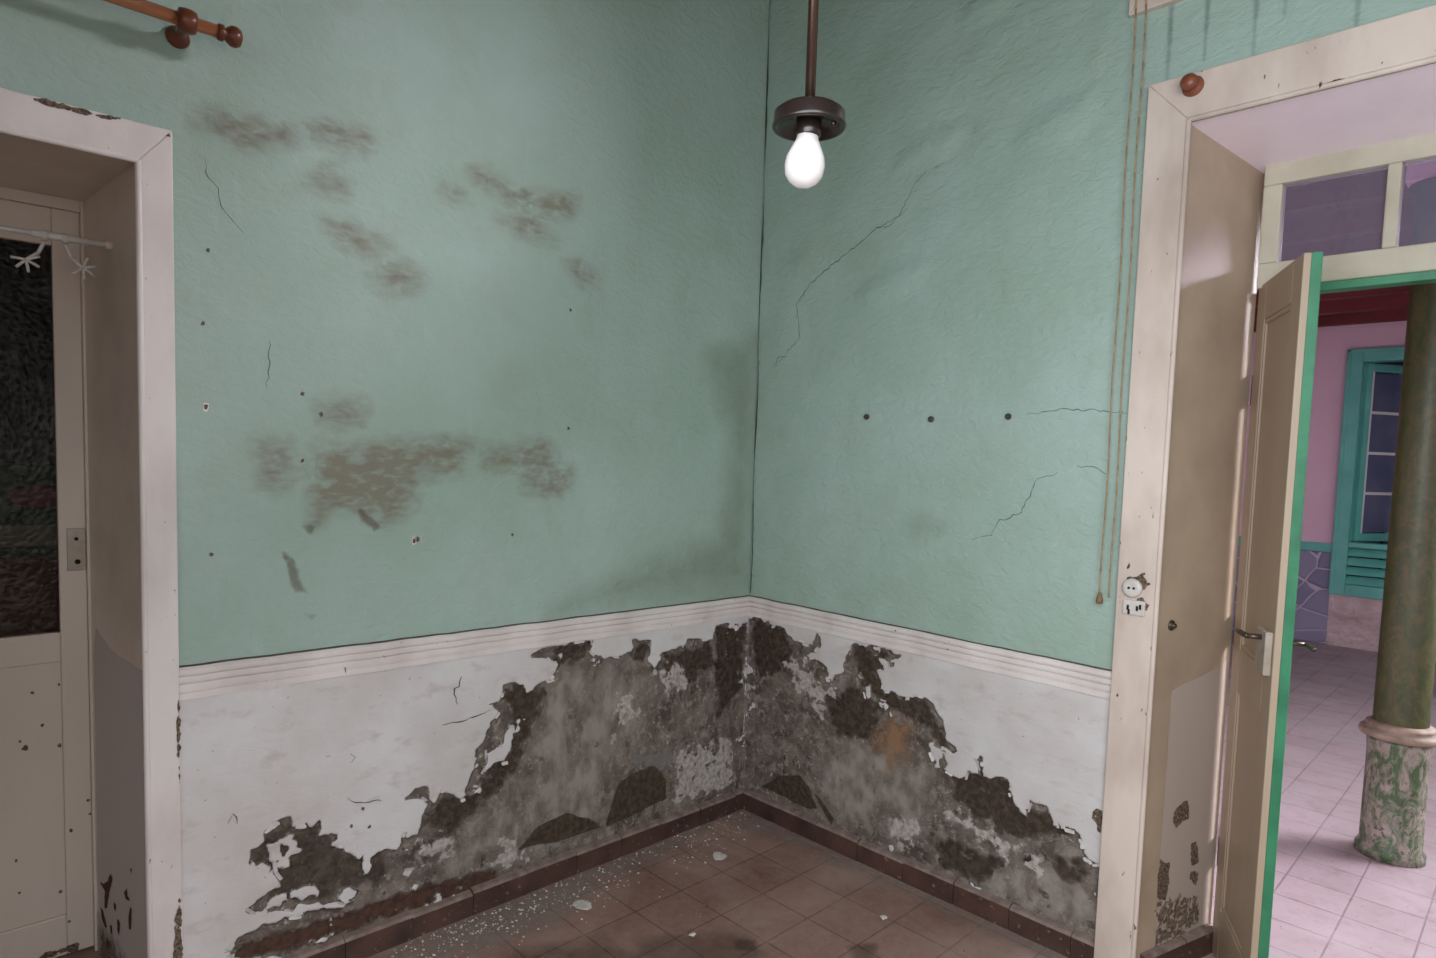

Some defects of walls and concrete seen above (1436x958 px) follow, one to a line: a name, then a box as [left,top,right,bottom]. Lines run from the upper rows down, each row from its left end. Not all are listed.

crack [750,0,944,593]
crack [1028,407,1127,415]
crack [972,466,1105,540]
spalling [225,617,1099,958]
peeling [1092,809,1103,833]
peeling [1173,800,1189,828]
peeling [100,874,132,949]
peeling [1154,841,1199,947]
peeling [40,943,80,958]